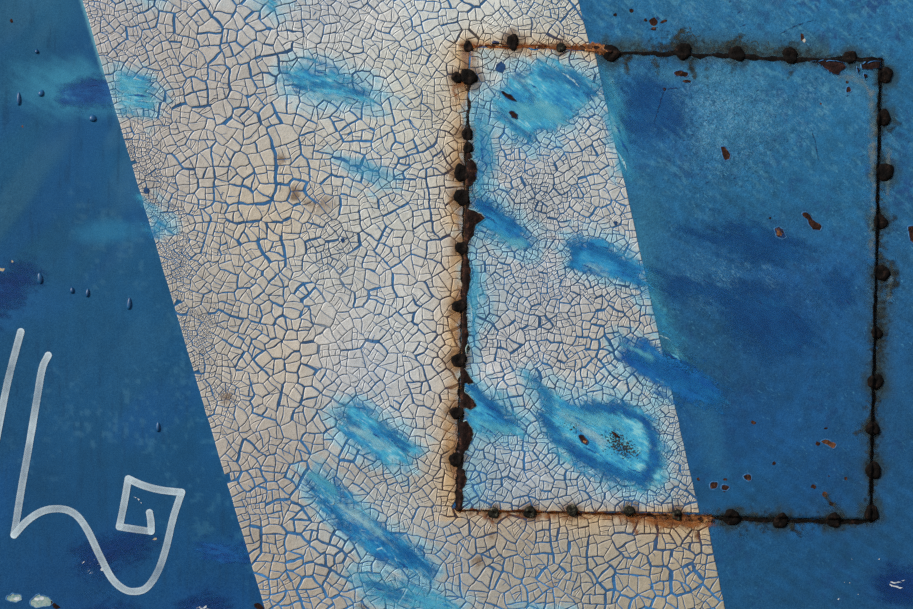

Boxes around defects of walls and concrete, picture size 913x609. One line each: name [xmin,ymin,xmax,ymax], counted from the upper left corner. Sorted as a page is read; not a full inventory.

rust [567,42,612,55]
crack [82,0,724,609]
rust [595,512,713,539]
peeling [6,593,60,609]